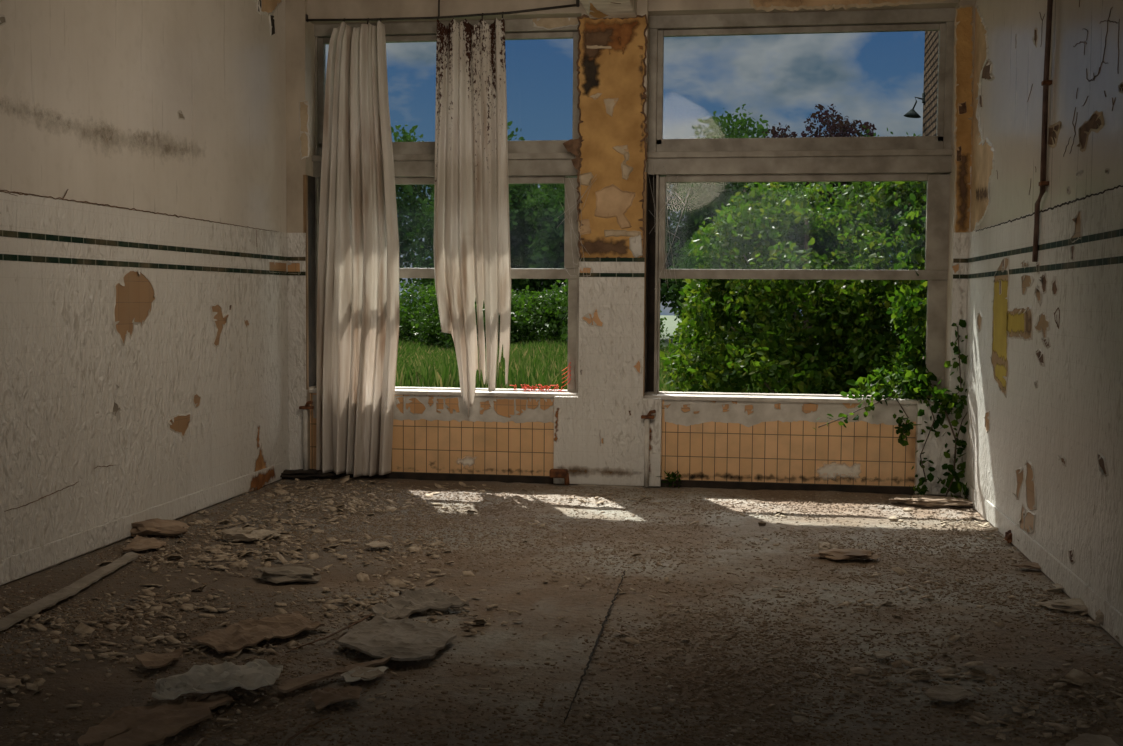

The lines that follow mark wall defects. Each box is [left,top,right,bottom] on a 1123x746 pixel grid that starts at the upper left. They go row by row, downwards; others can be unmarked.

spalling [254,0,282,36]
peeling [749,0,995,233]
peeling [1077,110,1104,152]
crack [1063,0,1120,157]
spalling [532,1,916,427]
peeling [112,269,156,347]
peeling [210,303,232,348]
peeling [977,256,1059,398]
peeling [393,395,554,423]
peeling [1013,459,1037,542]